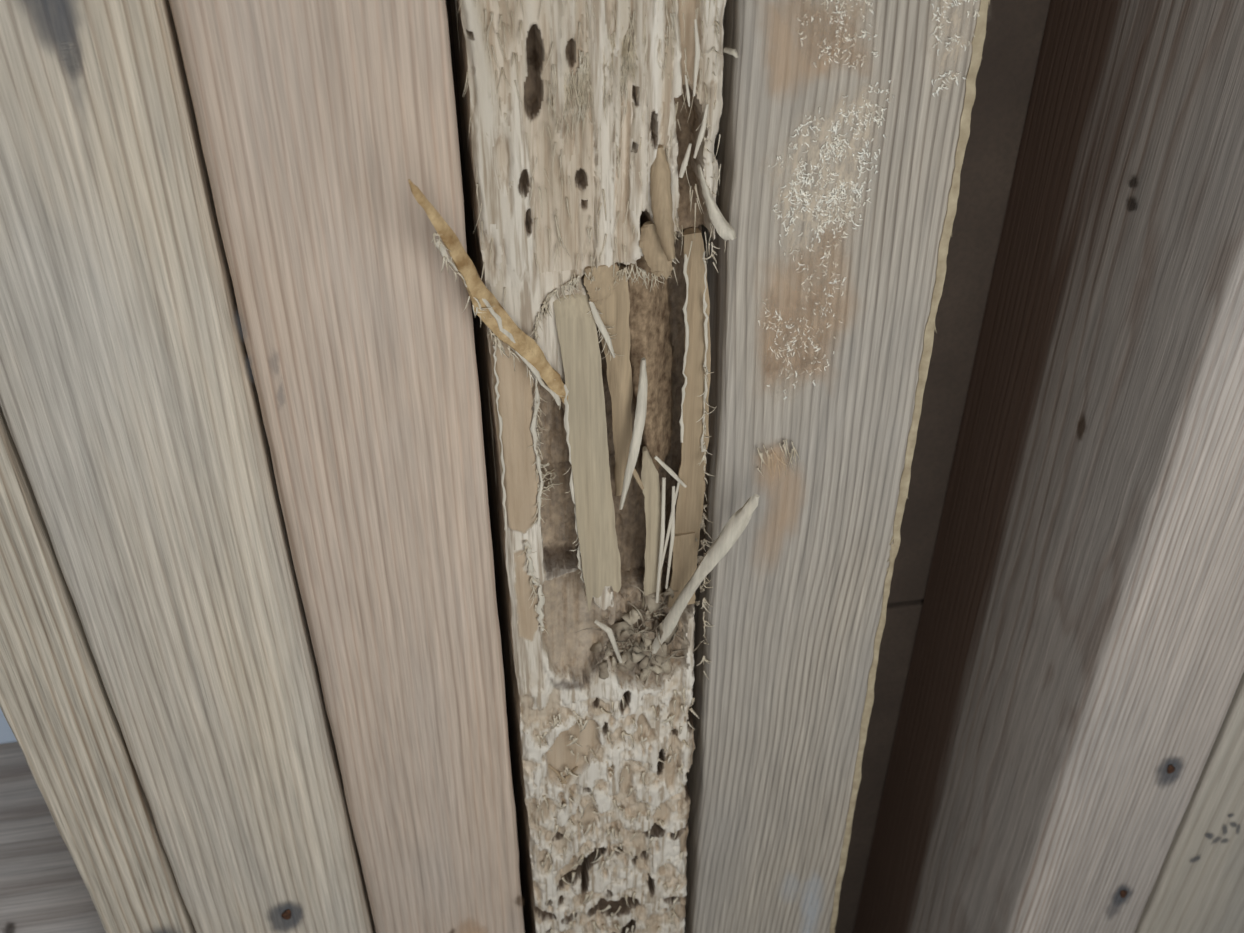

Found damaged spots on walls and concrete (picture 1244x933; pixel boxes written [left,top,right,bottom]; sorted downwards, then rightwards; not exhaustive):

peeling [697,164,736,241]
spalling [639,145,686,569]
hole [596,324,646,571]
spalling [657,749,666,775]
hole [652,822,689,838]
hole [533,847,655,933]